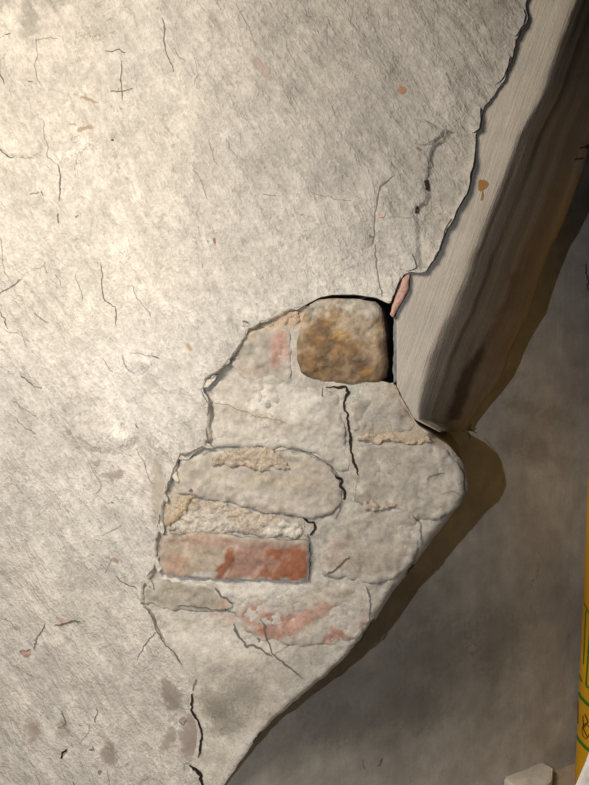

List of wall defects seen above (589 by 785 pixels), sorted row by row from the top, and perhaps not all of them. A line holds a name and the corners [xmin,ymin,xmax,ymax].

crack [108,49,132,97]
crack [162,19,174,72]
crack [31,166,78,223]
crack [100,263,117,325]
spalling [140,306,303,603]
crack [285,385,358,518]
crack [303,518,350,575]
crack [137,607,182,666]
crack [178,588,302,711]
crack [350,587,374,651]
crack [189,679,204,785]